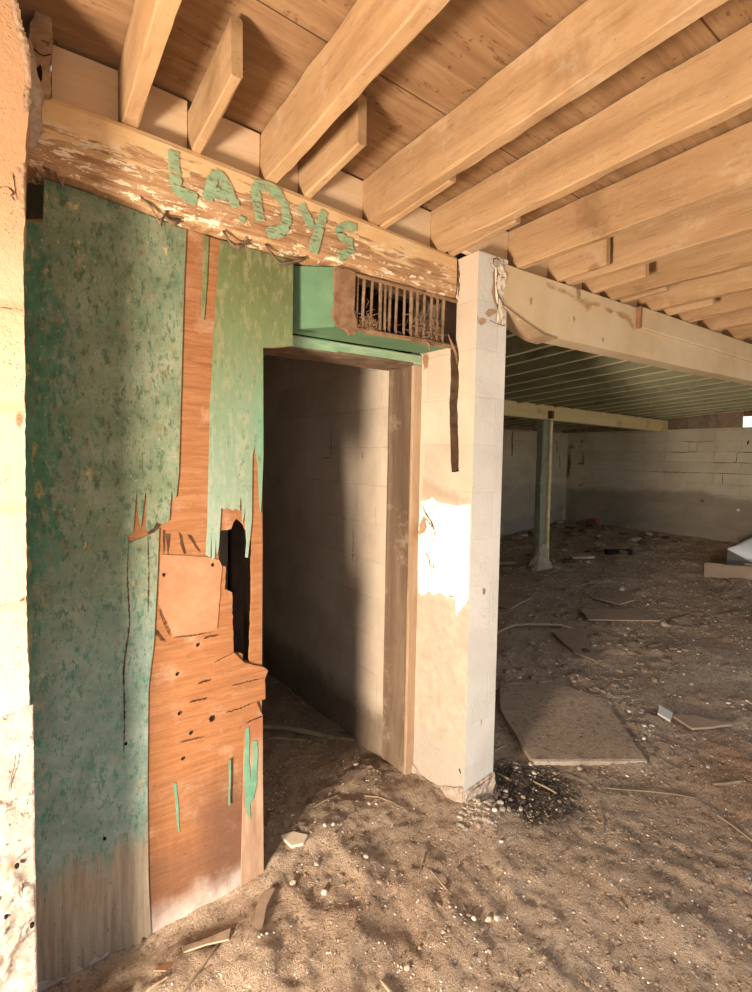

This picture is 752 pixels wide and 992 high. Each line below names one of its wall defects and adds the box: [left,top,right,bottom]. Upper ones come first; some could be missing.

peeling [418,497,471,616]
peeling [0,705,37,992]